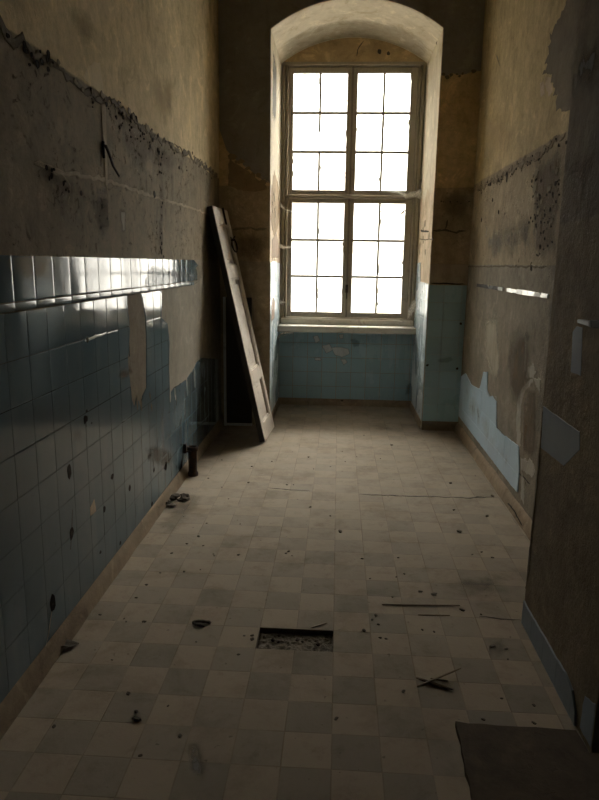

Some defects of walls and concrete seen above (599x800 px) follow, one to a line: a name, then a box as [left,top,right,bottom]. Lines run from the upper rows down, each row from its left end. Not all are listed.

spalling [0,15,218,179]
peeling [540,0,580,112]
spalling [477,133,567,256]
peeling [127,293,152,411]
peeling [161,275,204,402]
peeling [516,363,541,447]
peeling [257,633,333,652]